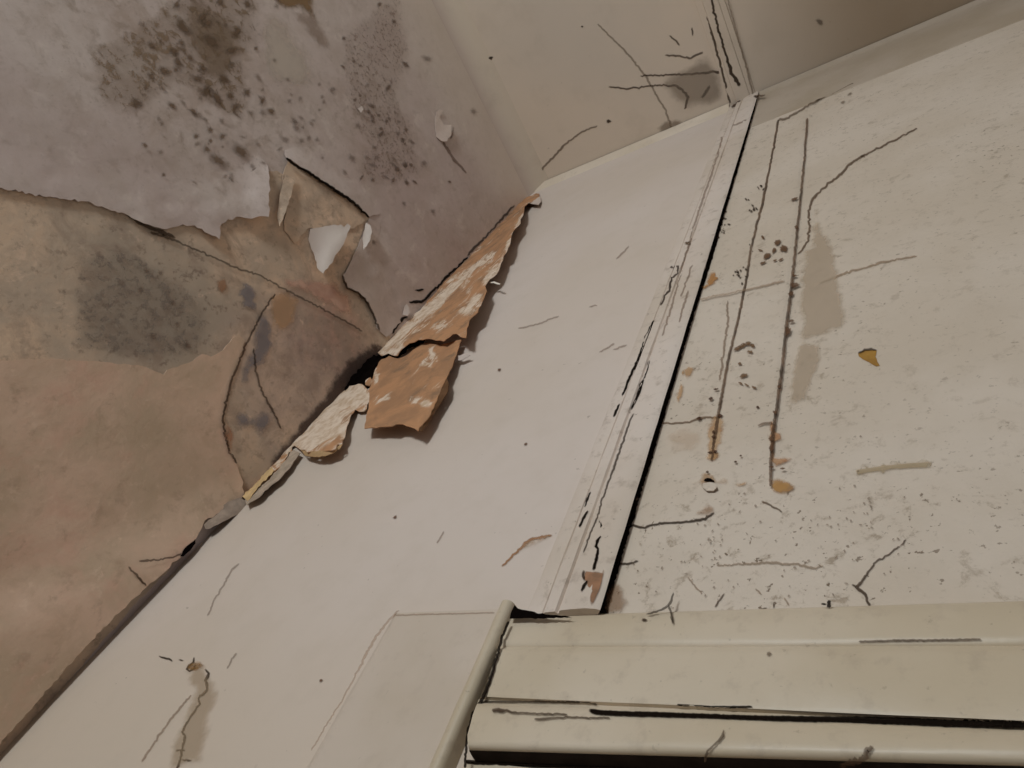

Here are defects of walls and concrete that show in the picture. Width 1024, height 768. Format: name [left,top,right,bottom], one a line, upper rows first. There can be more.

mould [96,0,257,113]
water stain [278,0,312,13]
water stain [240,284,270,374]
crack [129,206,514,463]
crack [579,0,917,614]
water stain [793,237,842,400]
spalling [858,348,880,366]
peeling [0,143,425,754]
crack [129,554,181,585]
spalling [581,571,603,603]
crack [647,593,674,623]
crack [159,656,210,768]